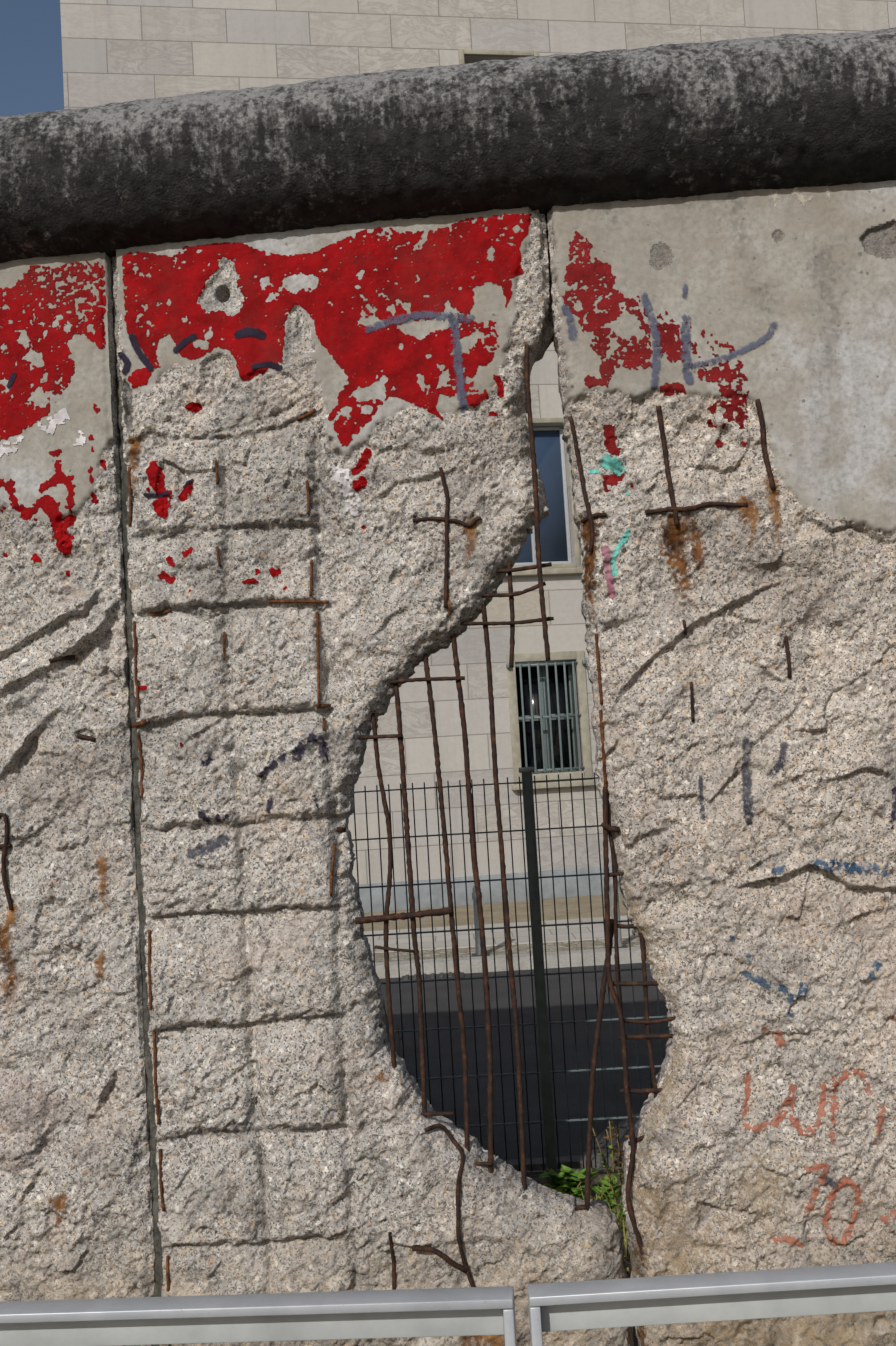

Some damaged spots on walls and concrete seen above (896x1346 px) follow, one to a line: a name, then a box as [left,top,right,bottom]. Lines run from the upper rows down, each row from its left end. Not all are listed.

peeling [0,261,116,458]
rust [464,519,477,558]
rust [579,514,598,620]
rust [660,512,705,606]
rust [739,479,781,546]
spalling [115,209,896,1346]
spalling [0,441,155,1302]
rust [0,904,17,997]
rust [49,1194,67,1223]